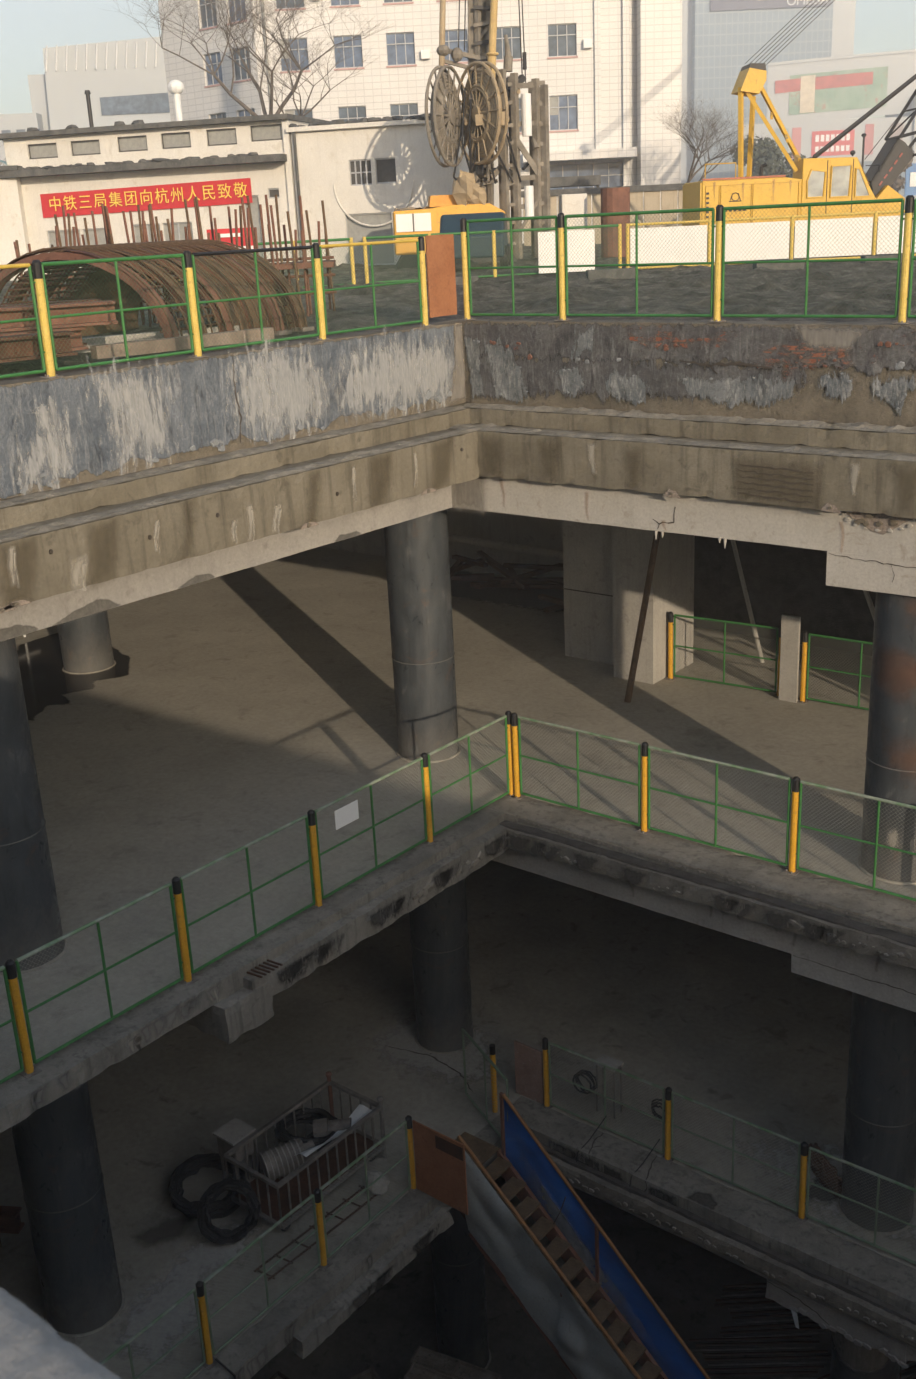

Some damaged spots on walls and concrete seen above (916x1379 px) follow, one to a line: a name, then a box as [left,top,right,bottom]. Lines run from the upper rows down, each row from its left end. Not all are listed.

efflorescence [13,397,80,496]
efflorescence [86,364,178,475]
damp [228,334,452,444]
peeling [0,321,916,499]
damp [436,443,497,511]
spalling [0,599,31,613]